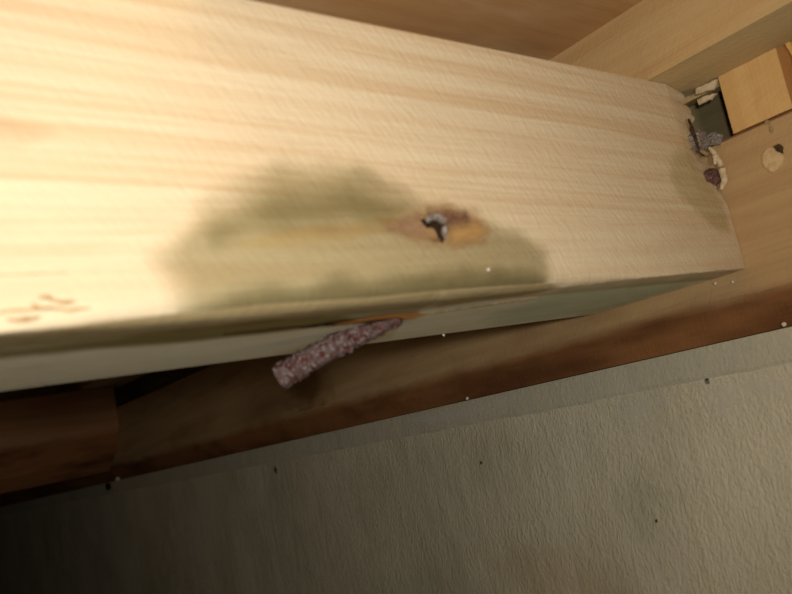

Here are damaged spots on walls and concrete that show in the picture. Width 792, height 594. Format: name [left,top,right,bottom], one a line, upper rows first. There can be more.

spalling [695,79,718,106]
spalling [687,118,728,191]
rust [396,208,484,243]
crack [223,319,374,335]